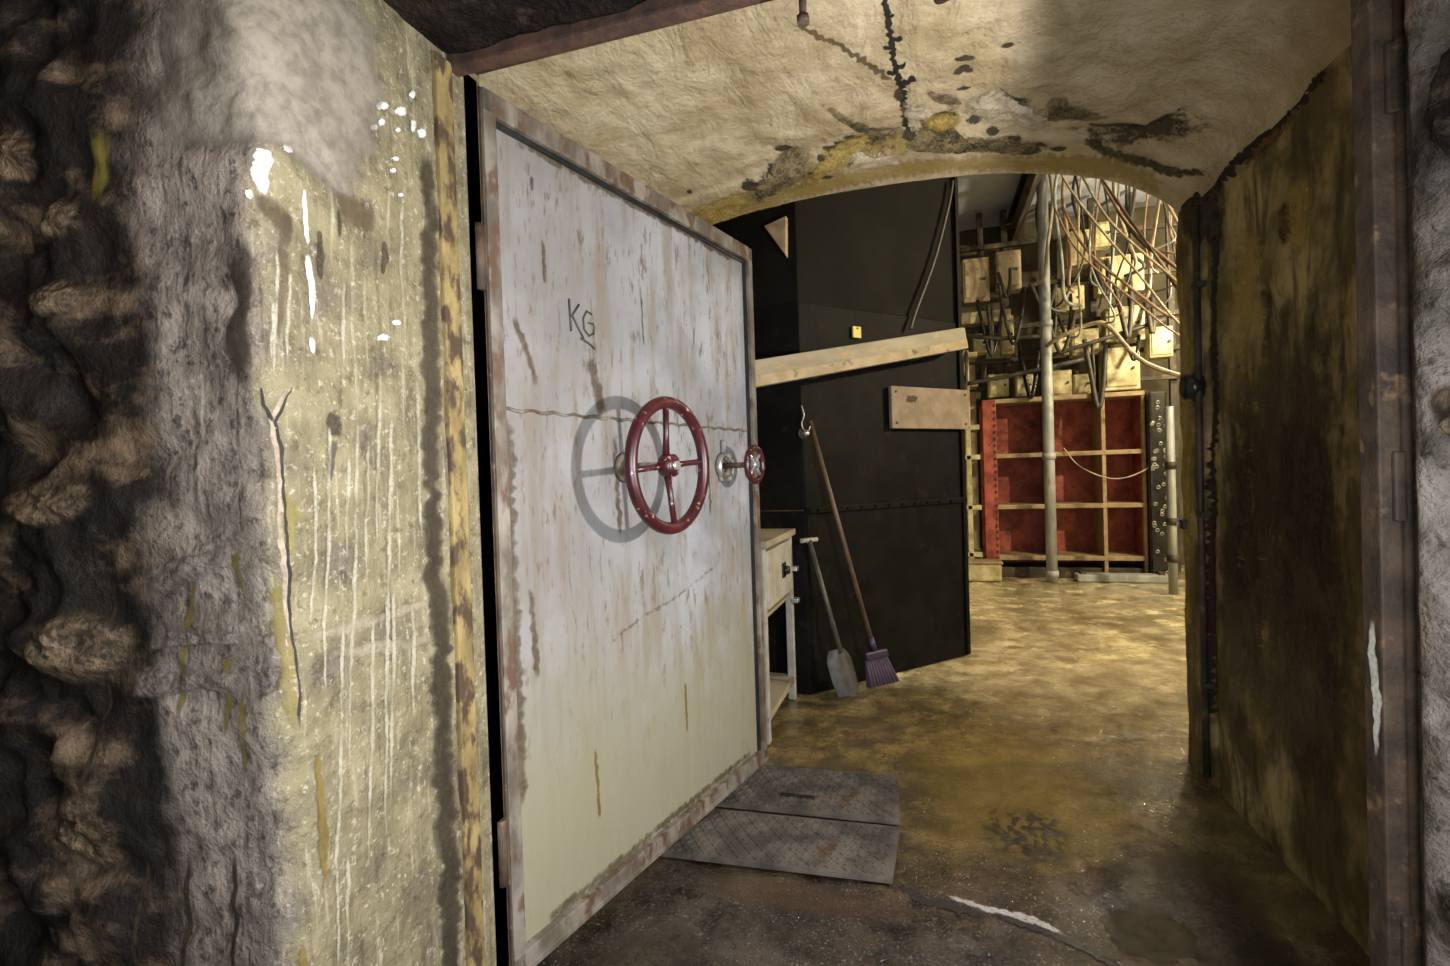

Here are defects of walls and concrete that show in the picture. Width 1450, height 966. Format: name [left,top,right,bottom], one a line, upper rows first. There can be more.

spalling [687,55,1106,225]
leakage [270,191,315,368]
crack [260,388,302,722]
leakage [310,409,392,681]
leakage [369,595,416,802]
leakage [334,813,350,955]